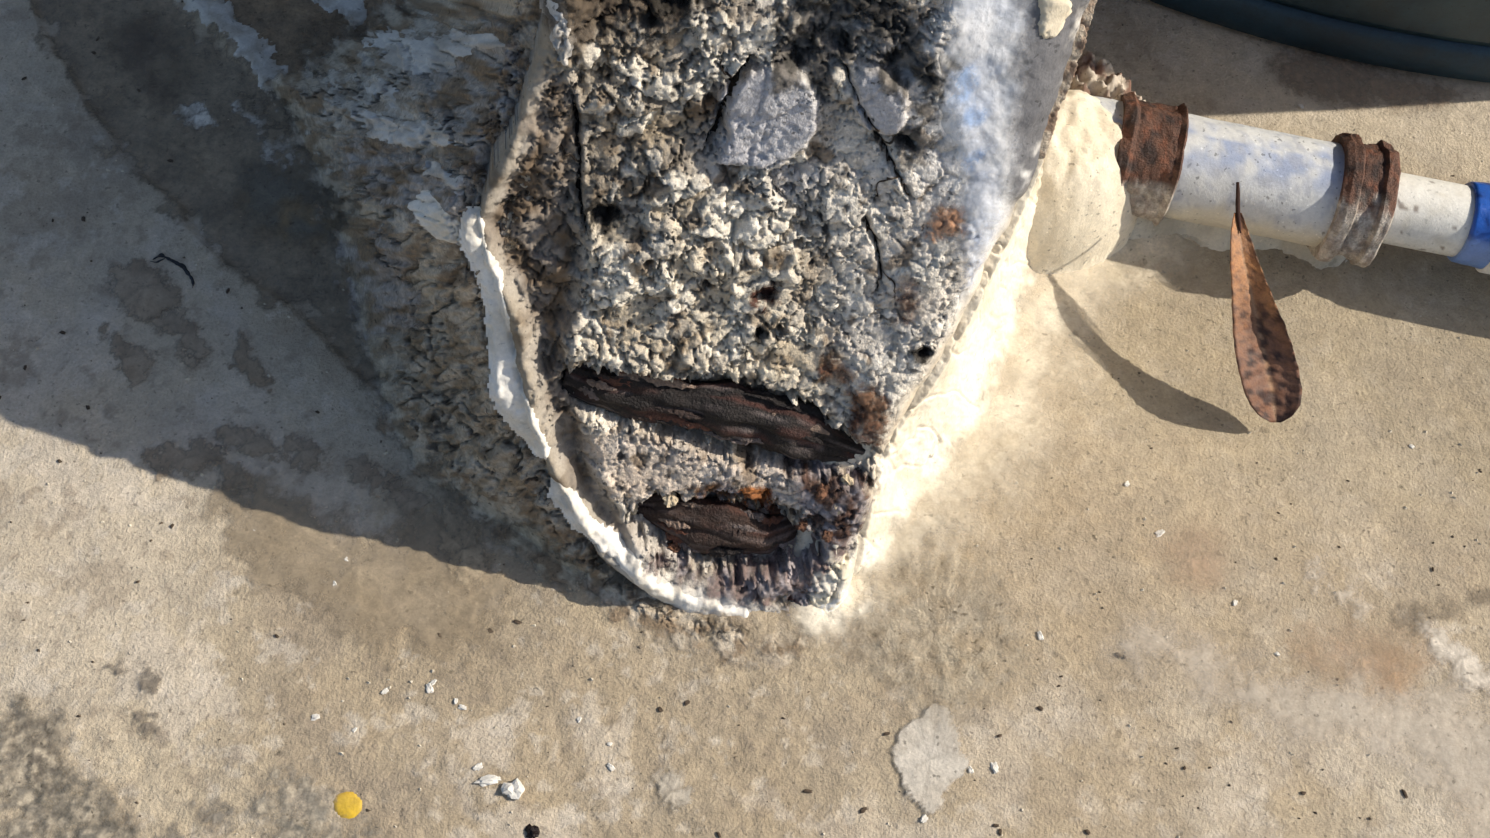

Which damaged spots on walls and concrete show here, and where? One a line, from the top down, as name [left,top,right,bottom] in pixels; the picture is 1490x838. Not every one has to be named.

crack [558,94,588,235]
crack [704,54,752,147]
crack [845,65,925,300]
spalling [31,0,1010,695]
rust [819,361,891,446]
rust [646,455,879,616]